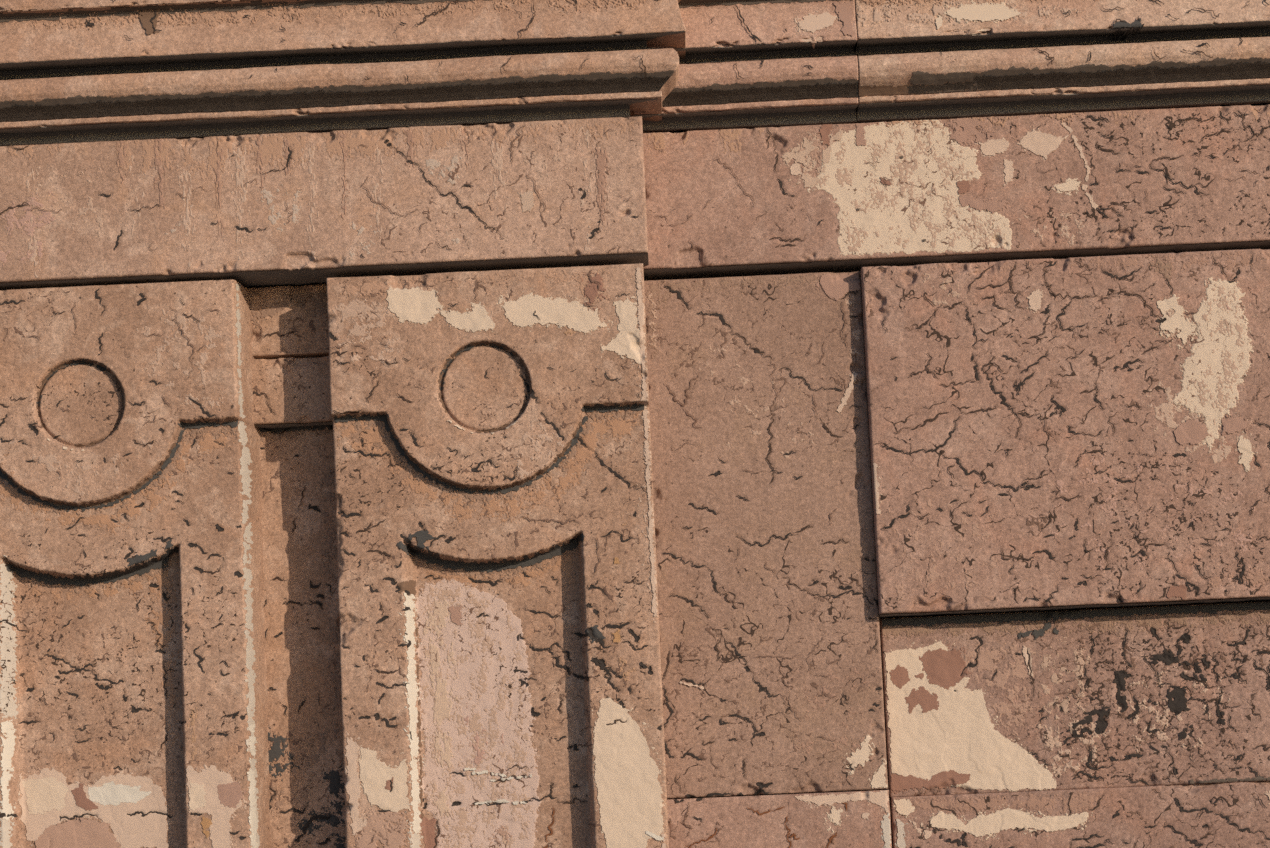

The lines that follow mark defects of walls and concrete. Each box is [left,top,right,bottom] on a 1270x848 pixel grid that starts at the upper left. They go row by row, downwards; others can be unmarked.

peeling [855,123,866,146]
peeling [950,118,995,146]
crack [114,186,212,250]
peeling [957,180,1005,213]
crack [0,289,221,491]
peeling [449,606,489,625]
peeling [870,641,1063,736]
peeling [0,758,169,848]